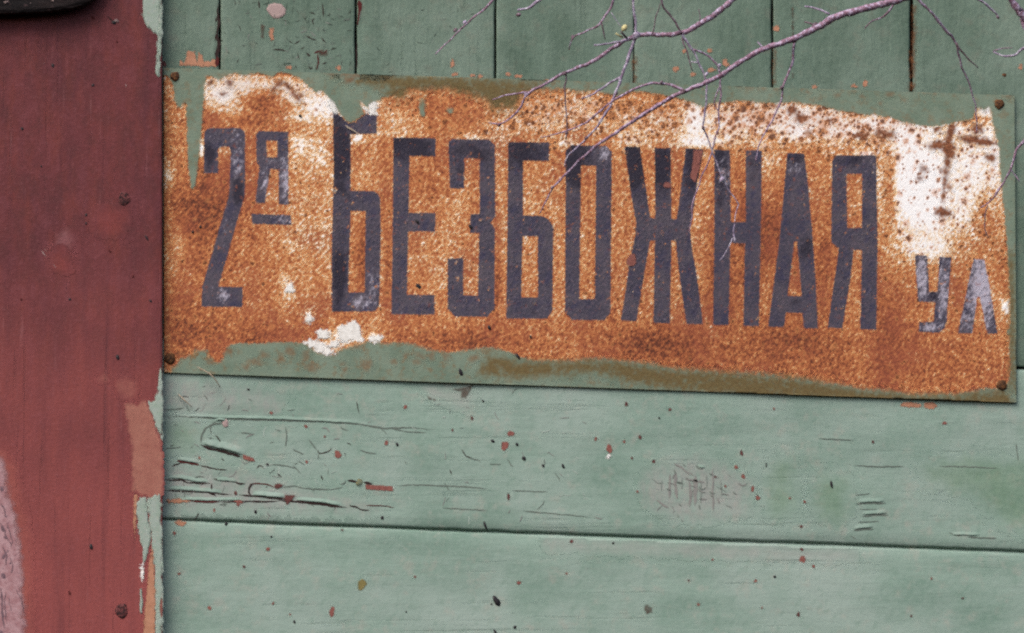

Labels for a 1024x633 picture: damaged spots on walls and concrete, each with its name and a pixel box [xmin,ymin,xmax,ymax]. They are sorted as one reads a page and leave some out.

peeling [143,0,167,76]
peeling [180,51,216,67]
corrosion [205,76,237,98]
corrosion [268,77,306,107]
corrosion [321,73,549,119]
corrosion [767,103,814,137]
corrosion [854,126,899,144]
corrosion [913,121,999,221]
corrosion [465,250,1017,402]
corrosion [203,344,319,375]
peeling [96,368,393,633]